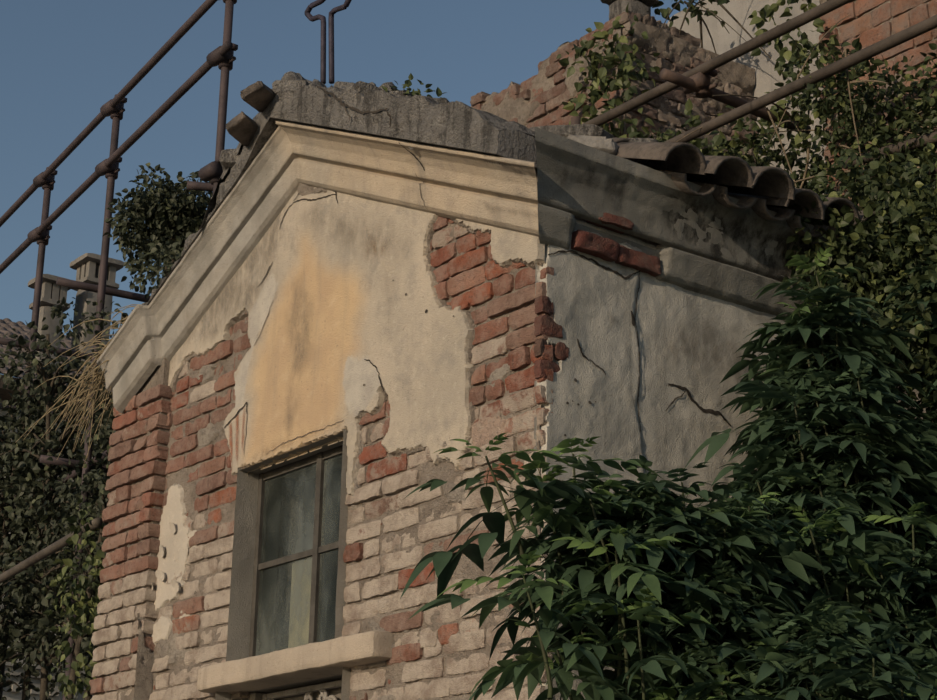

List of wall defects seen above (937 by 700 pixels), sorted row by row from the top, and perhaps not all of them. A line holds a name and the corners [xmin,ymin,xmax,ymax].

spalling [571,213,661,277]
spalling [89,309,251,700]
spalling [342,216,569,700]
crack [548,250,641,431]
crack [666,383,731,427]